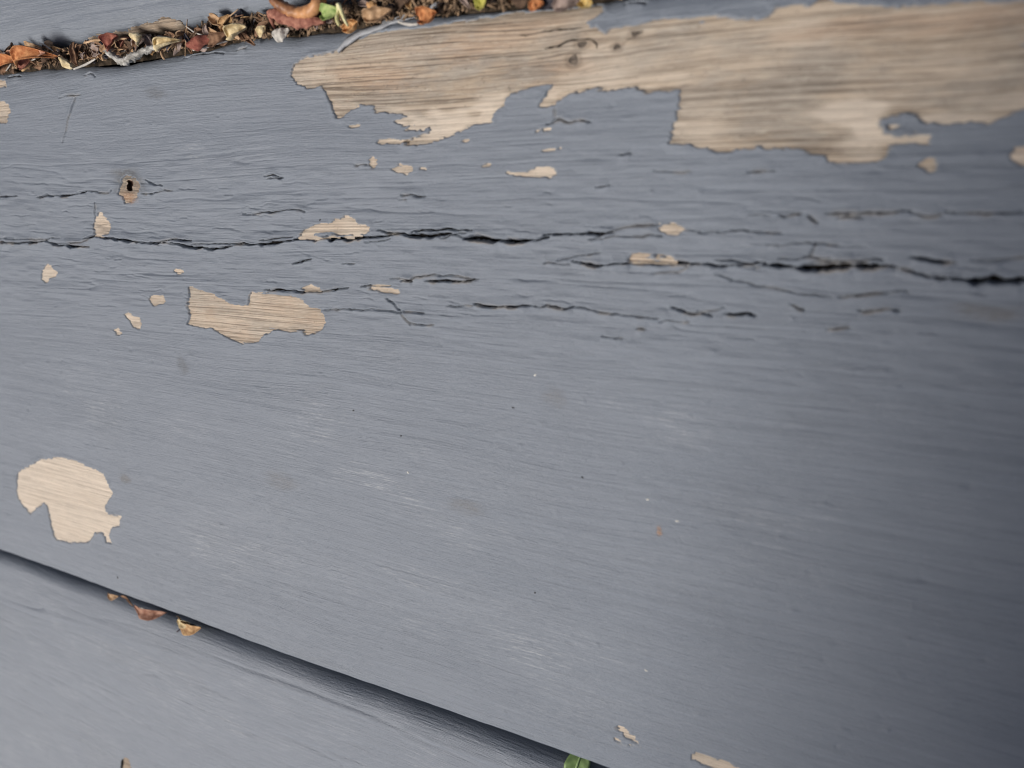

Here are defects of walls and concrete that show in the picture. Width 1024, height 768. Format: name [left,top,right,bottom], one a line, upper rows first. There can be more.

peeling [292,0,1024,165]
peeling [507,166,556,178]
peeling [94,212,111,238]
peeling [298,215,370,241]
crack [2,236,311,263]
crack [269,224,755,339]
peeling [629,253,678,265]
crack [656,210,1024,329]
peeling [188,284,326,344]
peeling [17,457,122,543]
peeling [615,725,638,745]
peeling [692,752,739,768]